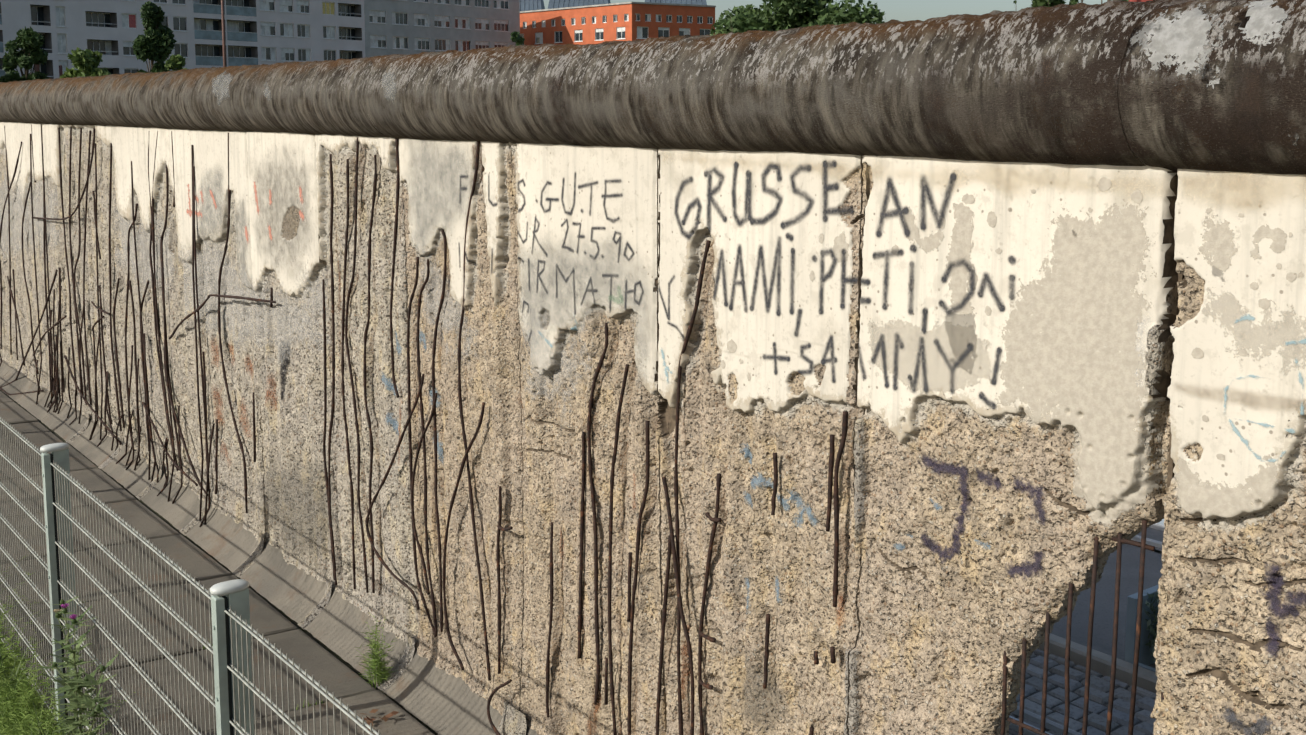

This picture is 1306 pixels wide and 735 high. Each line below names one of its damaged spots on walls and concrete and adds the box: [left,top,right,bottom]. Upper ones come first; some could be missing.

leakage [550,78,581,146]
spalling [0,124,159,483]
crack [1151,171,1188,401]
spalling [134,133,1306,735]
corrosion [588,691,601,735]
crack [1186,628,1304,710]